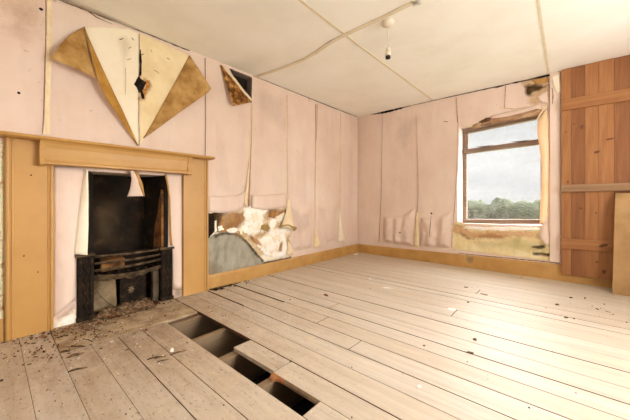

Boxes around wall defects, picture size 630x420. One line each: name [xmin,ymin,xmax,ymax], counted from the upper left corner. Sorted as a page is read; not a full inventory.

flaking render [62,0,150,146]
spalling [229,68,252,103]
spalling [208,206,291,275]